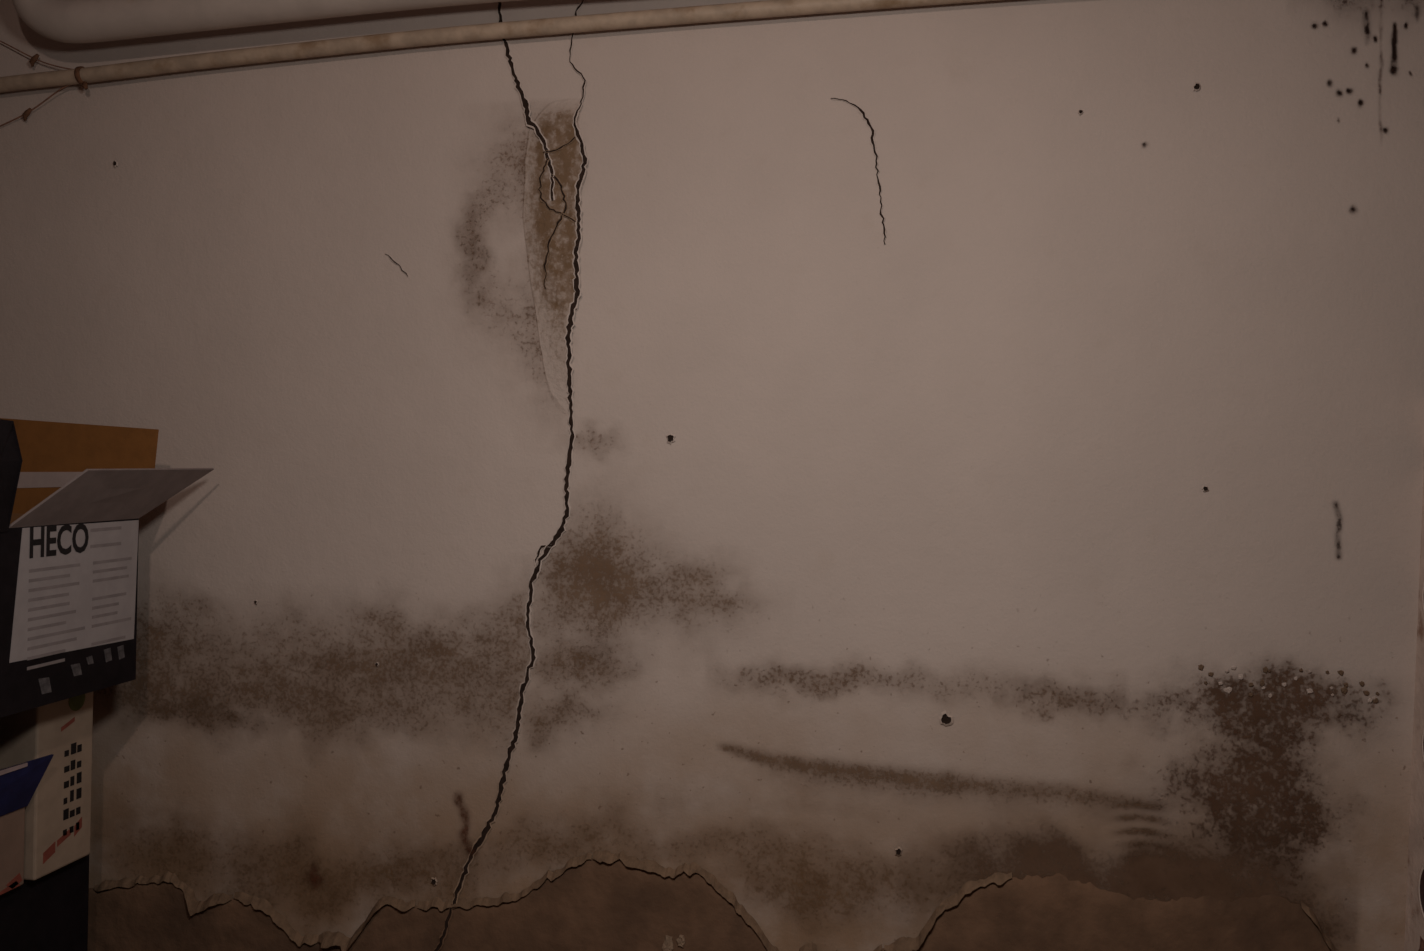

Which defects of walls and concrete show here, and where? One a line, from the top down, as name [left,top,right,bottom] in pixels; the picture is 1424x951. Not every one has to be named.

leakage [1380,23,1397,68]
crack [831,97,887,244]
crack [433,0,588,951]
leakage [540,522,739,636]
leakage [97,599,617,743]
leakage [742,666,914,695]
leakage [948,661,1389,938]
peeling [88,850,779,951]
peeling [874,872,1339,951]